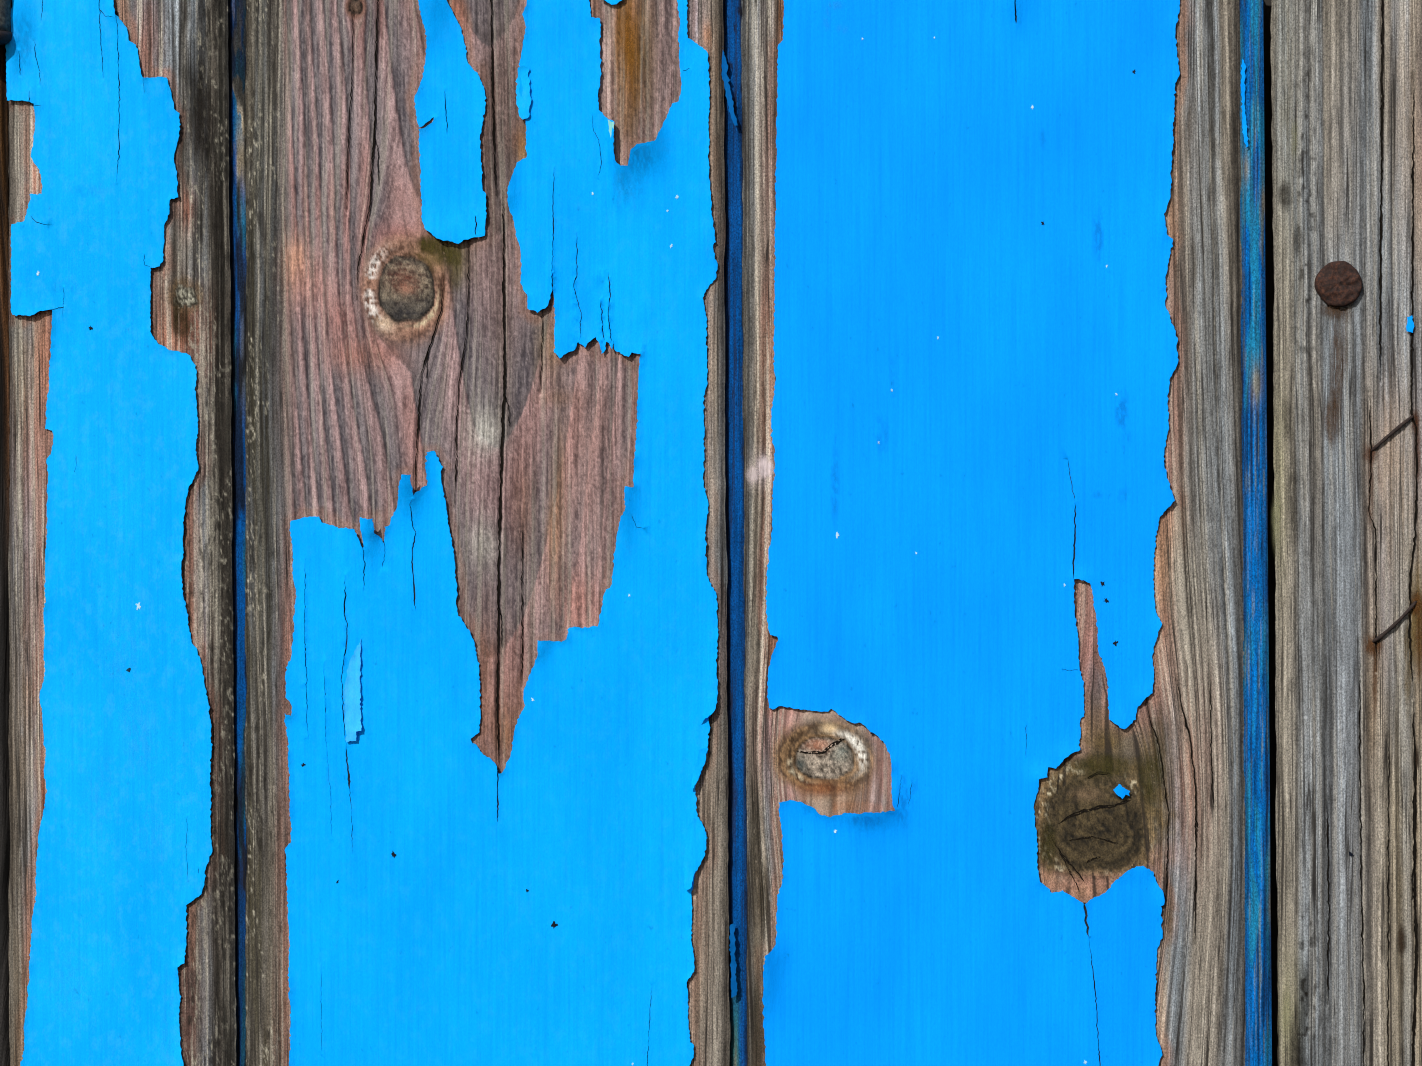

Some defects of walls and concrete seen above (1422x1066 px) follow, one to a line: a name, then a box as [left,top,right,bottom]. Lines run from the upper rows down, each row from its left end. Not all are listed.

peeling [8,100,53,1066]
peeling [114,0,641,1066]
peeling [589,0,898,1066]
crack [1050,771,1131,1066]
peeling [1034,0,1249,1066]
crack [1146,679,1214,945]
peeling [1406,316,1414,333]